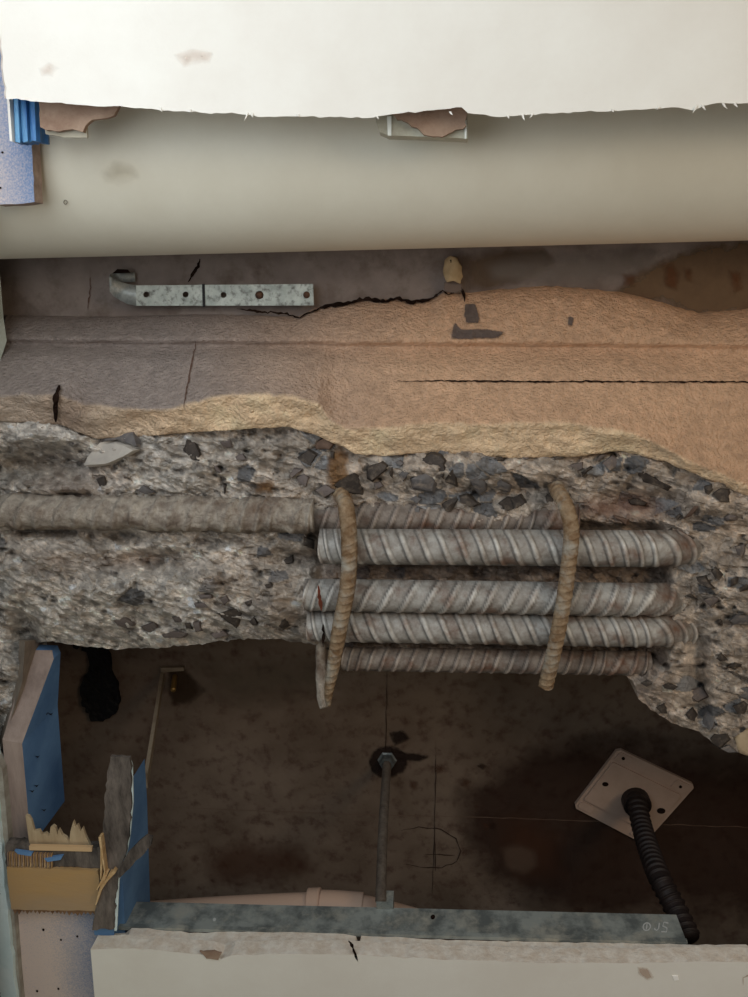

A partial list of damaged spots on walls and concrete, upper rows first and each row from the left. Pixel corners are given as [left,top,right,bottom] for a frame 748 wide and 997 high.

crack [241,287,466,318]
water stain [469,241,748,313]
crack [394,377,748,385]
spalling [0,421,748,753]